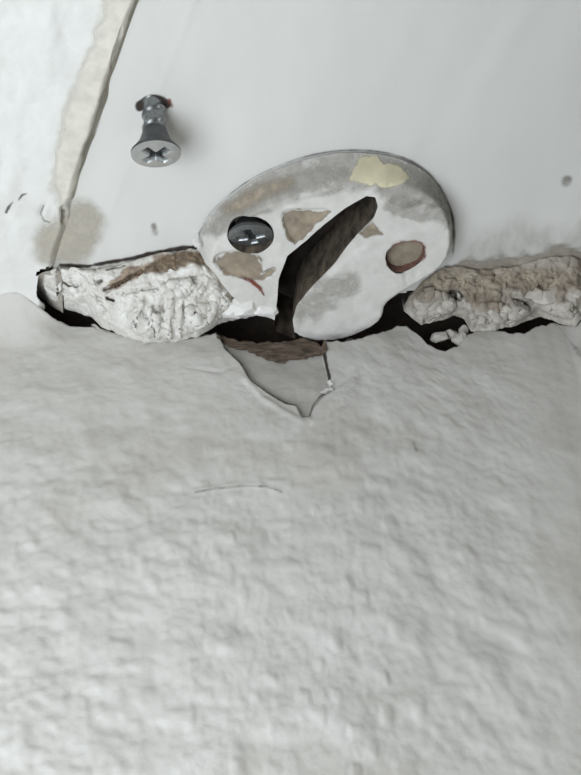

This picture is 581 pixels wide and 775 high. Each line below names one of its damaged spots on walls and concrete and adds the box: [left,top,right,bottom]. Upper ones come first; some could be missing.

spalling [37,248,334,417]
spalling [401,245,581,332]